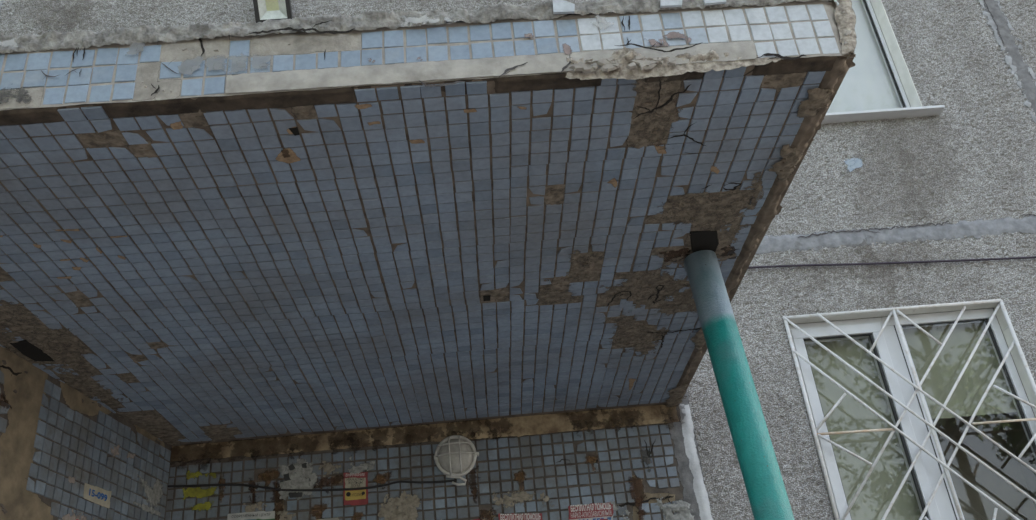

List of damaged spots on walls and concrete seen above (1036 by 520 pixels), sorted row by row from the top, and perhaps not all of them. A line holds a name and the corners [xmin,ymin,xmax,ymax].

peeling [250,30,362,56]
peeling [401,14,452,27]
crack [614,16,703,52]
peeling [0,87,44,109]
peeling [132,35,230,130]
peeling [225,36,834,154]
crack [634,79,691,119]
peeling [76,130,159,158]
crack [665,123,706,154]
peeling [844,158,863,172]
peeling [537,144,804,357]
peeling [0,300,187,520]